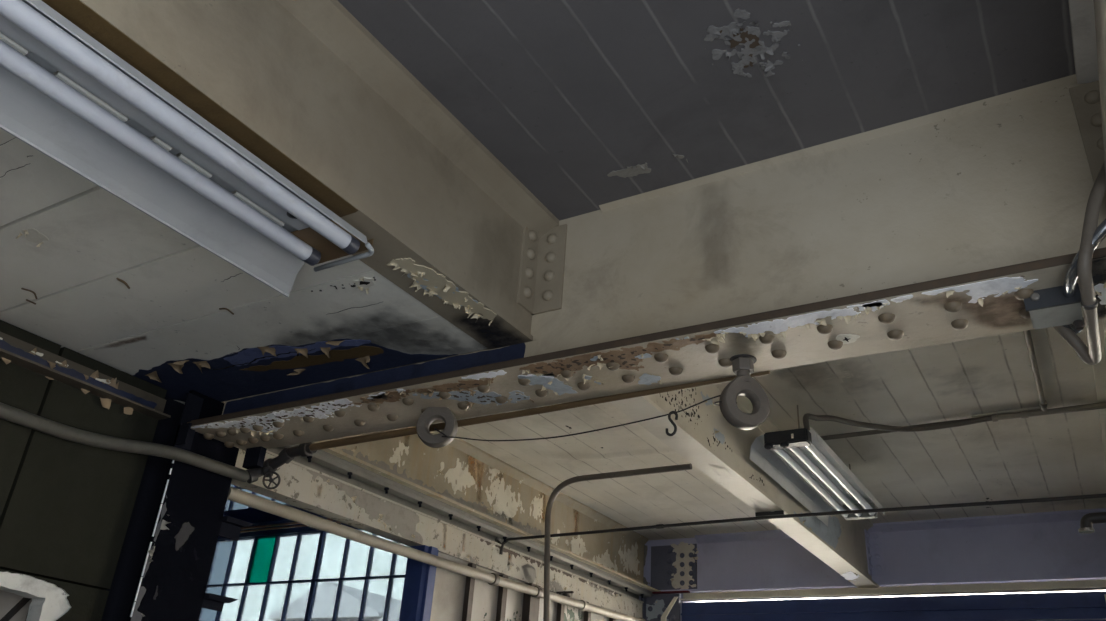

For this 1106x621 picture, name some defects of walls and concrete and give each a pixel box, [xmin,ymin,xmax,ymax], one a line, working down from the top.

peeling [386,258,497,326]
peeling [0,337,457,415]
peeling [191,276,1038,436]
peeling [307,469,423,544]
peeling [330,439,650,585]
peeling [131,495,194,621]
peeling [480,539,622,597]
peeling [670,542,699,589]